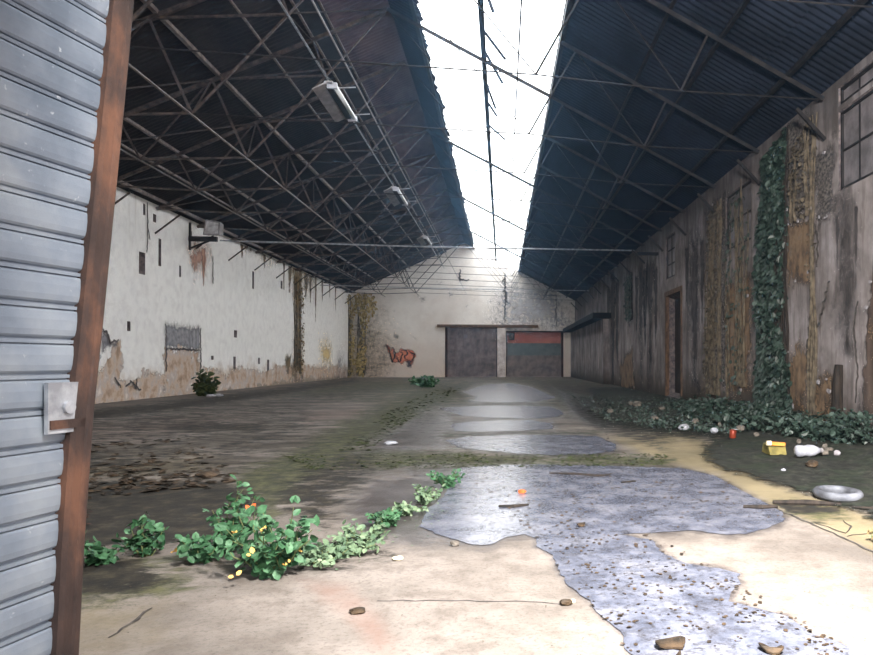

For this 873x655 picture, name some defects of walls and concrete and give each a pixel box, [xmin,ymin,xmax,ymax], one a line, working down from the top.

flaking render [95,321,176,404]
flaking render [862,275,873,436]
crack [768,504,873,552]